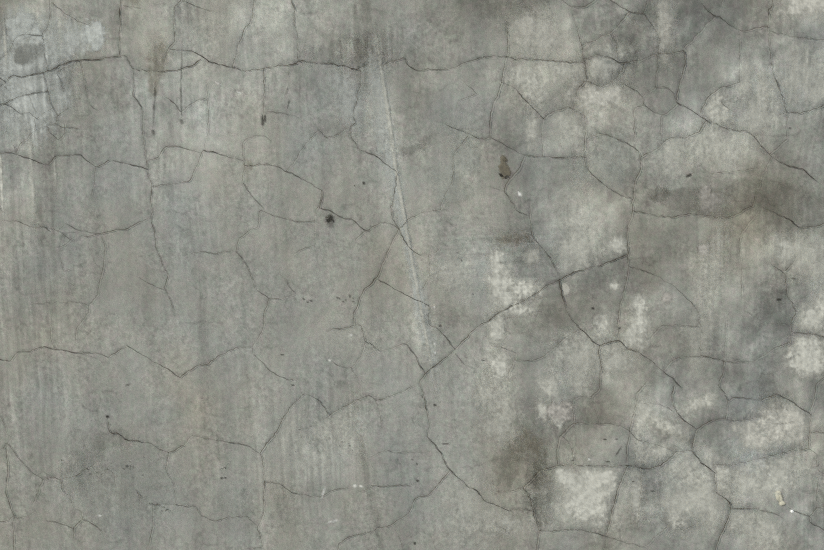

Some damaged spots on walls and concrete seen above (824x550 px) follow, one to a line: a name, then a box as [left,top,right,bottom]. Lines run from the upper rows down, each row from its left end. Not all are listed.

crack [0,0,365,139]
leakage [658,1,671,48]
crack [5,146,222,308]
crack [162,231,389,455]
crack [242,153,429,351]
crack [340,31,823,550]
crack [1,446,30,548]
crack [108,422,184,476]